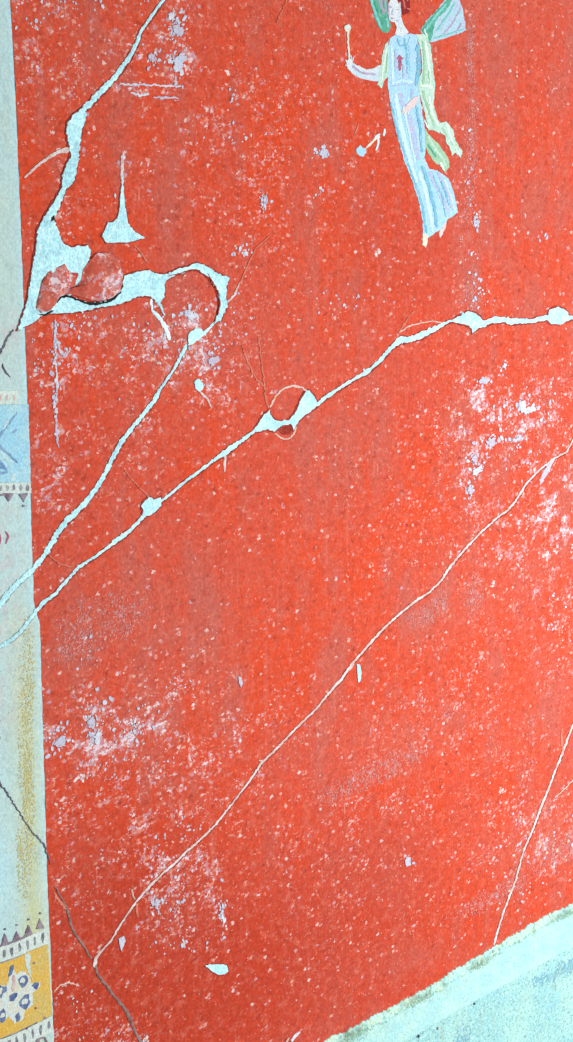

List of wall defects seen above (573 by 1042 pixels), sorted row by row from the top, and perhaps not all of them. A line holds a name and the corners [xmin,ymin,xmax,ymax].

crack [82,0,166,111]
flaking render [16,106,269,358]
peeling [49,340,66,418]
peeling [194,379,212,408]
peeling [207,351,221,370]
crack [0,306,573,649]
crack [0,438,573,1042]
peeling [204,963,229,976]